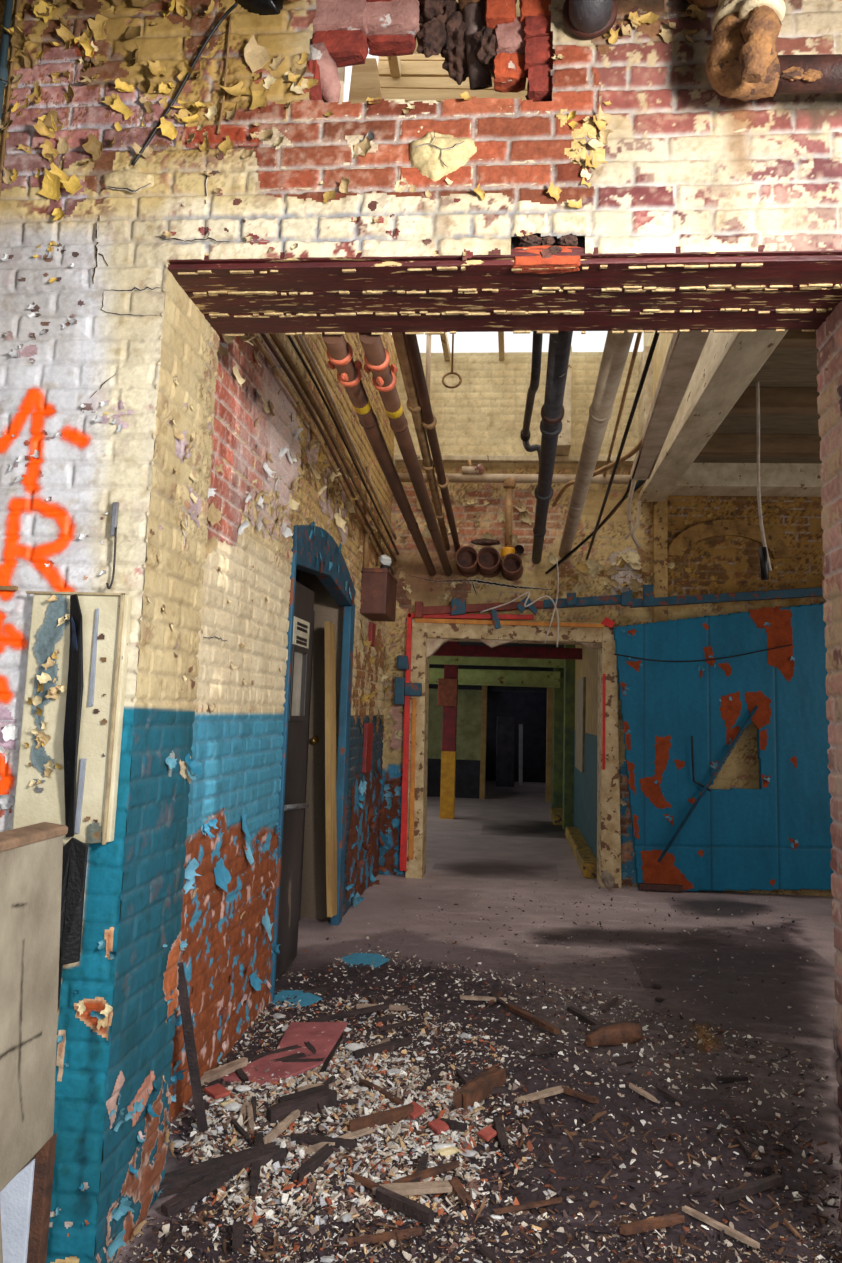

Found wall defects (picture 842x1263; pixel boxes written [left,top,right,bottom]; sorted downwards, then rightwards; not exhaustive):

flaking render [0,0,709,239]
peeling [243,219,275,252]
spalling [489,230,585,274]
peeling [0,594,70,793]
peeling [345,622,405,909]
peeling [84,816,102,843]
peeling [56,1030,69,1082]
peeling [74,989,113,1041]
peeling [96,807,281,1263]
peeling [49,1207,89,1237]